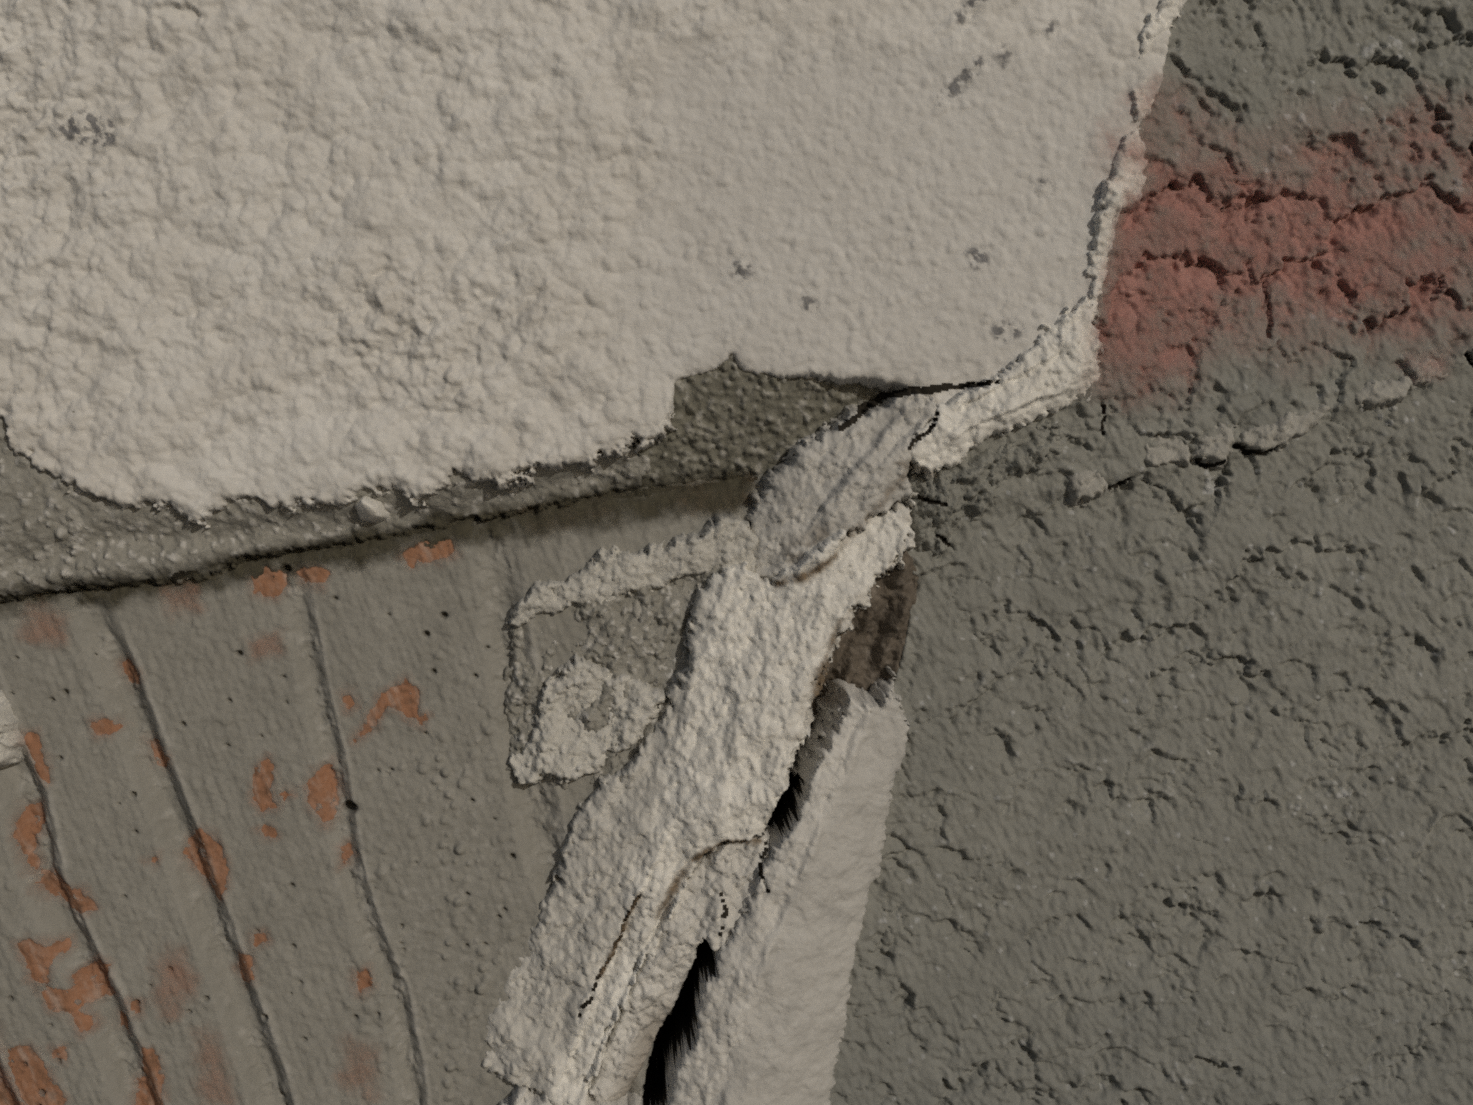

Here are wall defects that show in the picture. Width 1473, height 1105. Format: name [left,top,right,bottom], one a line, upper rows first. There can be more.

spalling [1139,0,1187,60]
spalling [949,52,1010,94]
crack [838,380,1000,450]
crack [469,483,706,521]
crack [917,495,951,547]
crack [0,584,95,601]
crack [145,571,200,581]
peeling [0,79,1154,1105]
crack [758,773,804,893]
crack [643,892,729,1105]